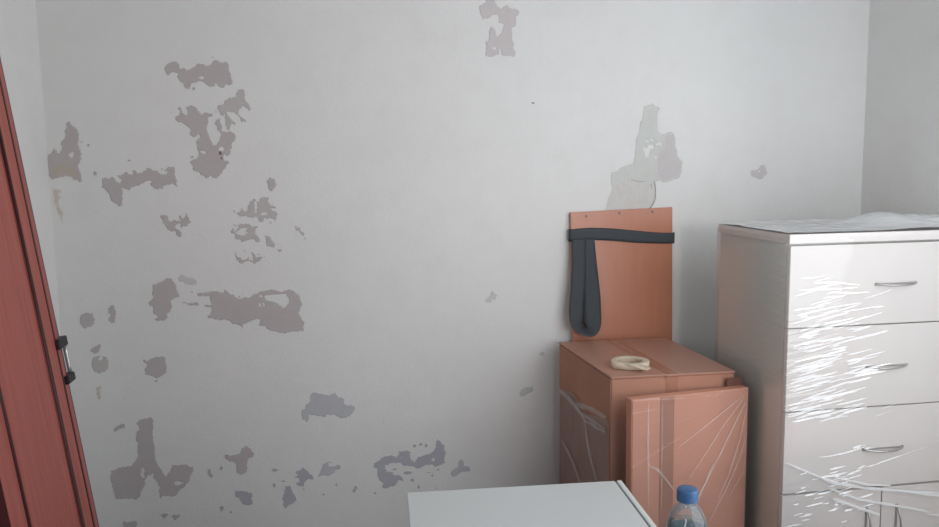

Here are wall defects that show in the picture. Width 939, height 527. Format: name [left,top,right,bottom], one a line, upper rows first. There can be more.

peeling [479,0,520,57]
peeling [47,121,90,225]
peeling [93,159,178,206]
peeling [164,56,252,179]
peeling [611,103,683,189]
peeling [230,177,282,264]
peeling [149,274,305,334]
peeling [143,356,168,382]
peeling [301,391,356,422]
peeling [110,416,255,500]
peeling [374,439,471,495]